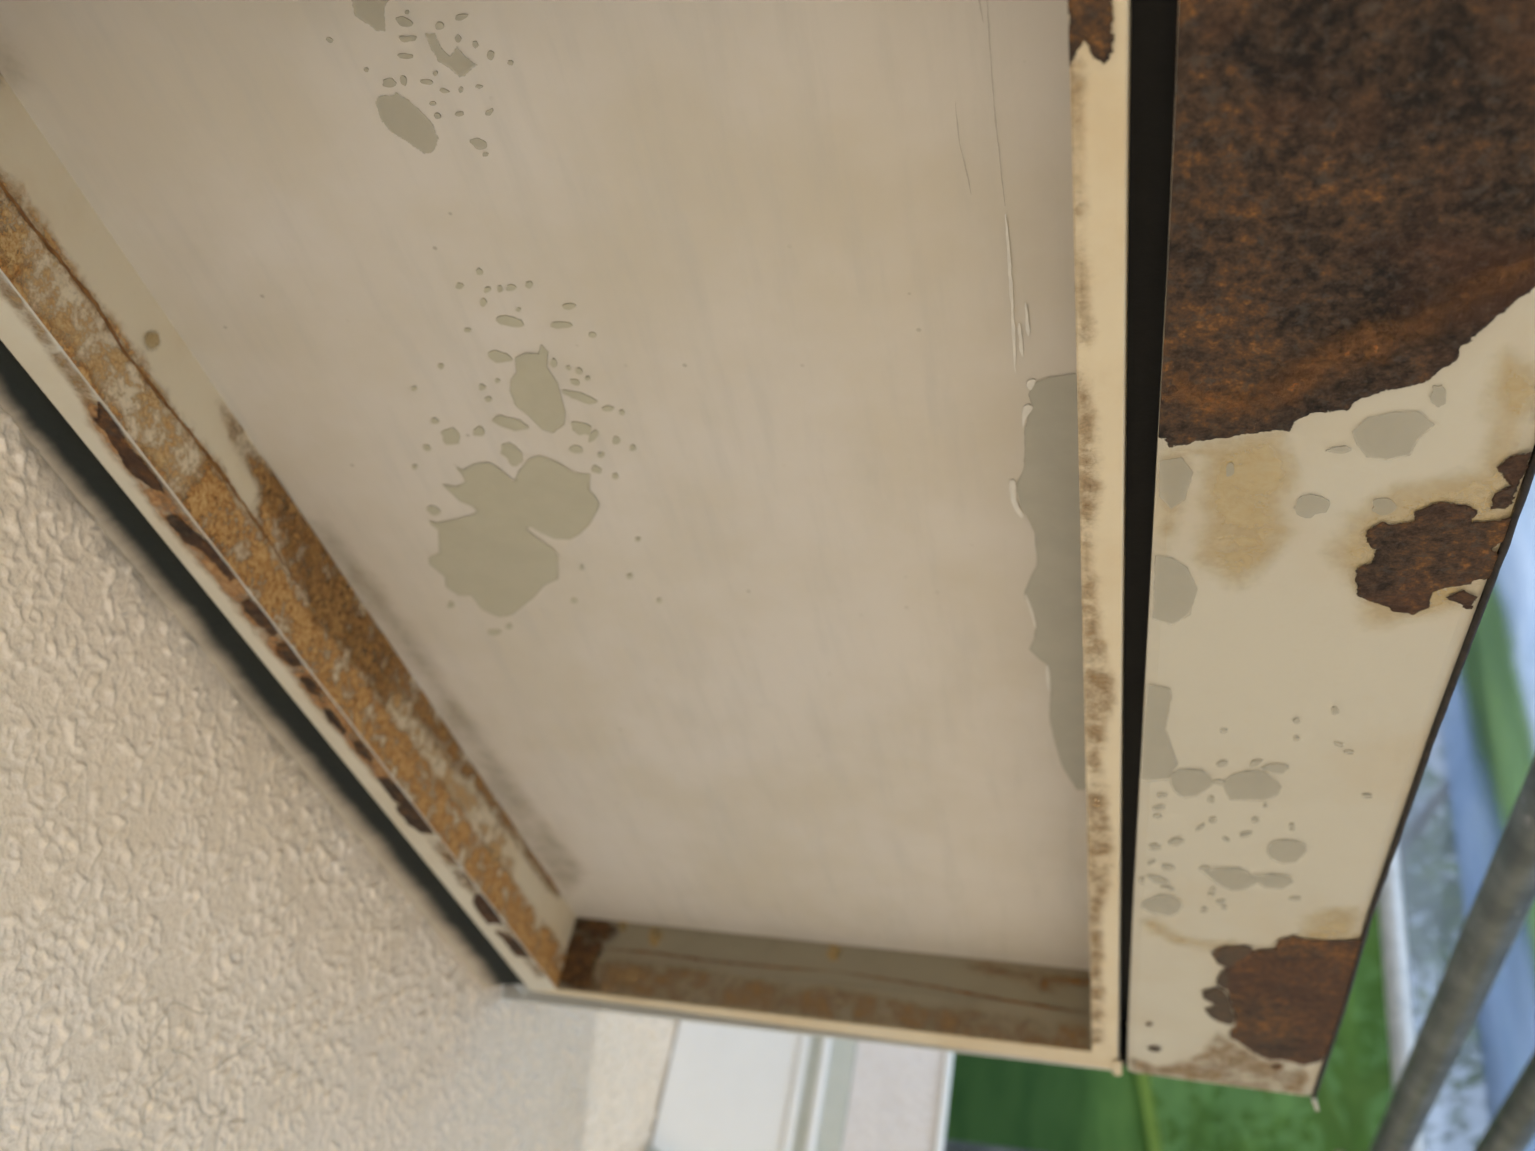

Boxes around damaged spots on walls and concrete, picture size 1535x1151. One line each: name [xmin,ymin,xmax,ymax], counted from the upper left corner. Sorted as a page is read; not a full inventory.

peeling [352,0,513,154]
corrosion [1068,0,1115,67]
peeling [455,268,533,328]
corrosion [1158,0,1535,448]
peeling [412,345,636,636]
corrosion [0,175,1111,1051]
peeling [1009,374,1086,790]
peeling [1294,494,1330,518]
peeling [1326,384,1446,460]
corrosion [1355,452,1533,615]
peeling [1139,685,1306,917]
corrosion [1132,936,1361,1092]